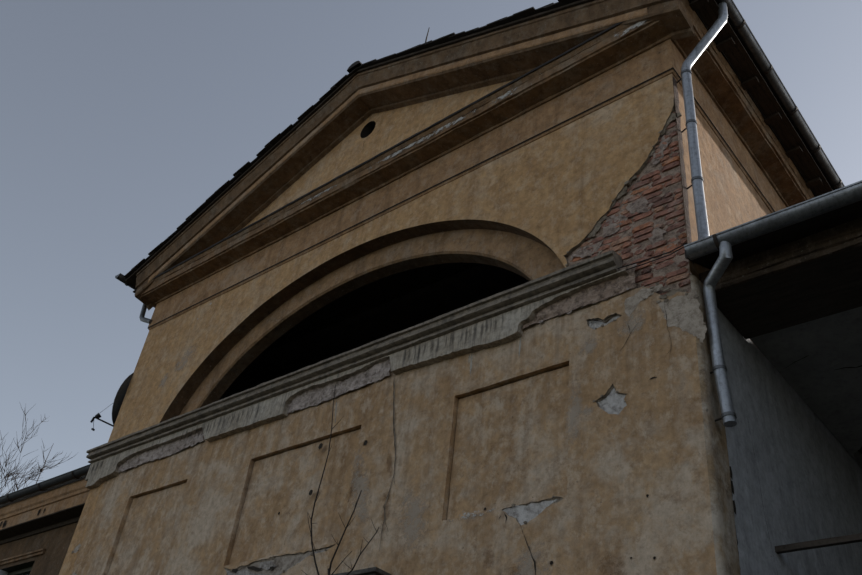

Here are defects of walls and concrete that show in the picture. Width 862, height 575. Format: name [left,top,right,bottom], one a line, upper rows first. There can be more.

flaking render [521,111,707,343]
flaking render [593,385,627,415]
flaking render [452,495,564,525]
crack [498,513,536,575]
flaking render [225,546,333,575]